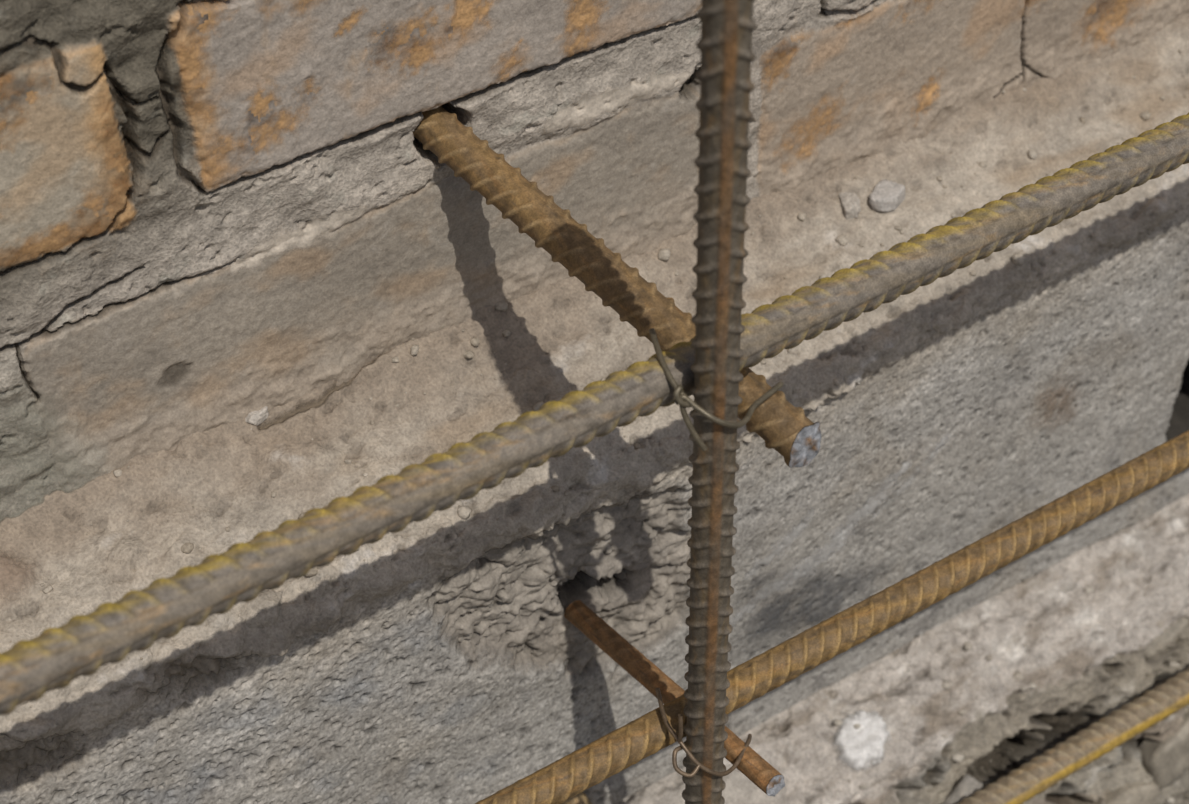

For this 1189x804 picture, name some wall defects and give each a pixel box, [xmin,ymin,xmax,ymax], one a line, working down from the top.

crack [994,6,1042,97]
spalling [428,488,691,675]
spalling [966,739,1010,777]
spalling [1032,711,1084,740]